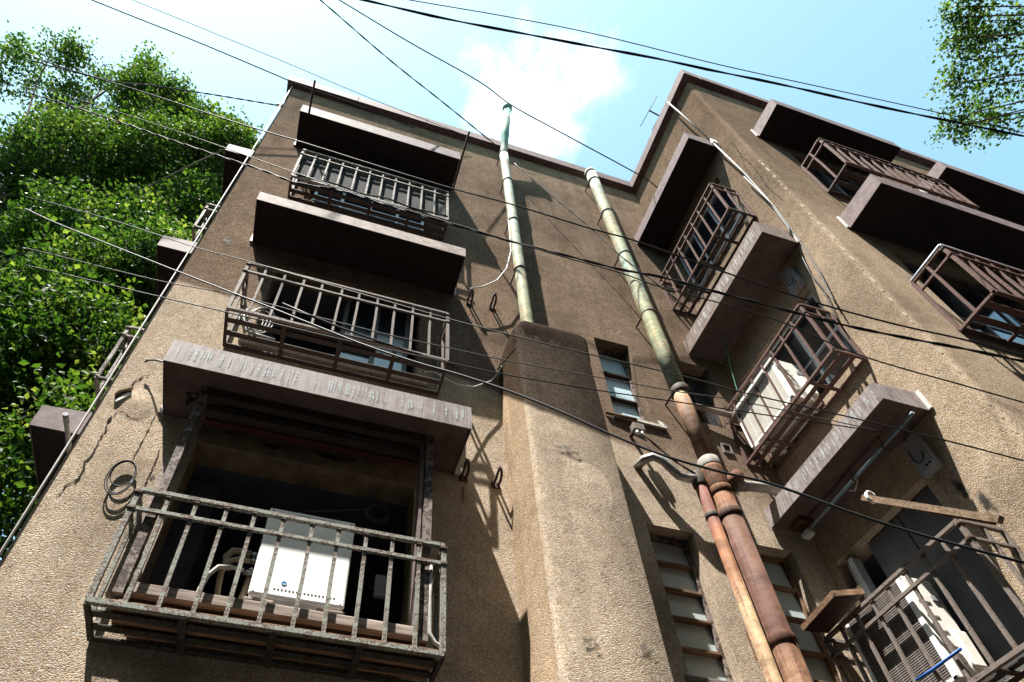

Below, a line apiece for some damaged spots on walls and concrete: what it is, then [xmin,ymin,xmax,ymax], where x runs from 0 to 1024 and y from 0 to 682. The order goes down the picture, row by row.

crack [56,411,160,498]